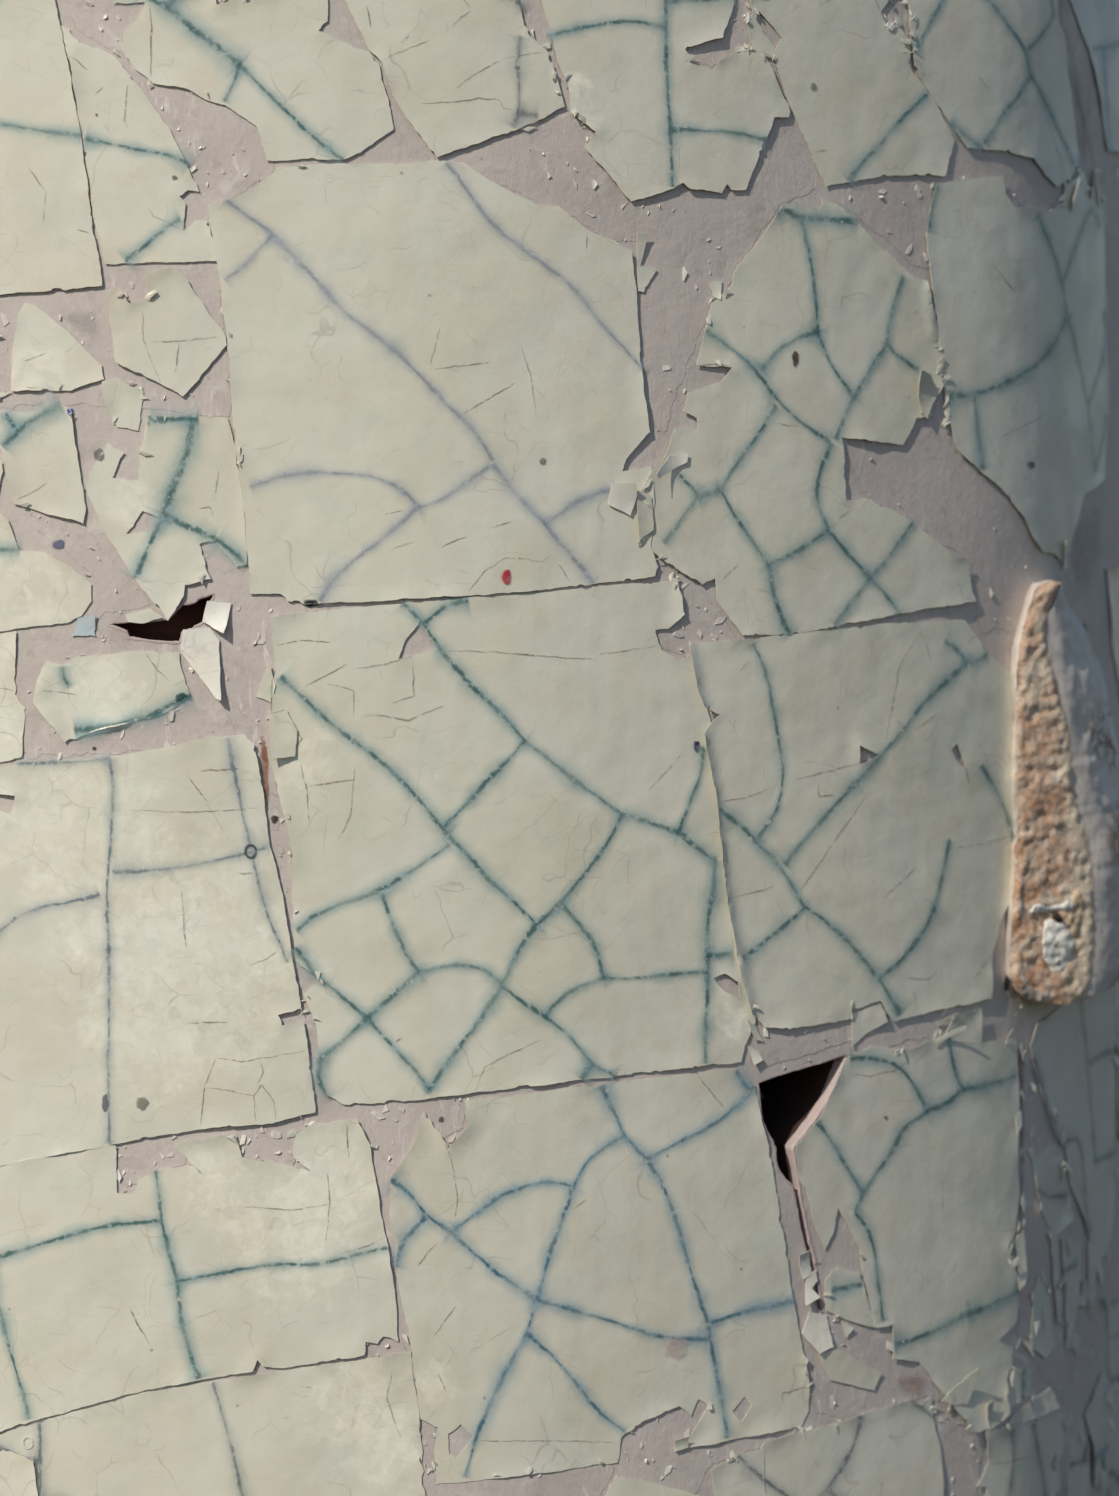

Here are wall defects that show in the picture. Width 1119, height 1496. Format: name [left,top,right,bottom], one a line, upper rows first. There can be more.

crack [0,122,189,165]
crack [126,0,343,160]
crack [436,0,766,186]
peeling [690,0,781,67]
crack [816,0,1075,182]
peeling [0,267,233,422]
peeling [21,511,317,867]
peeling [656,555,739,657]
crack [0,200,987,1496]
spalling [278,1000,320,1025]
peeling [418,974,1067,1496]
crack [816,1010,1115,1348]